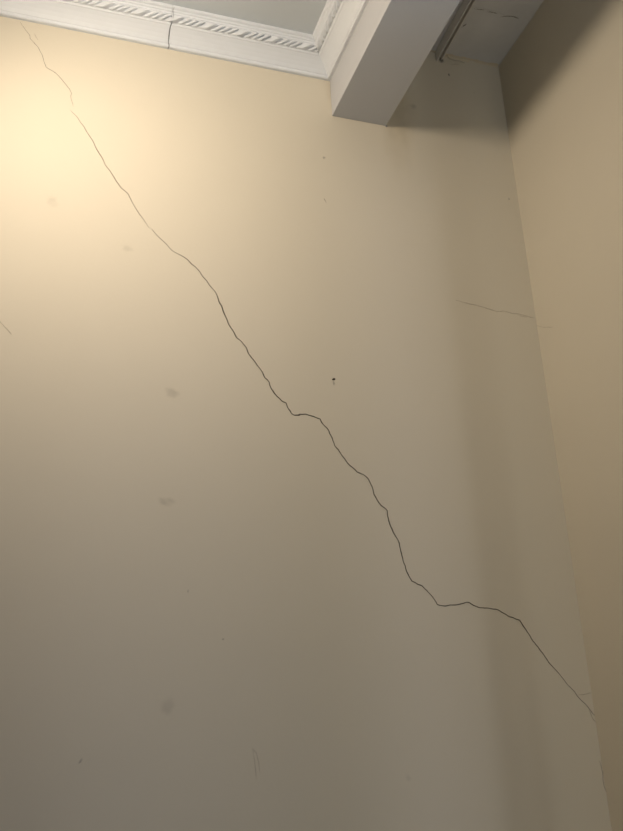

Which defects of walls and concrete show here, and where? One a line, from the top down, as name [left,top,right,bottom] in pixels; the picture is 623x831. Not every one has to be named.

crack [22,25,595,721]